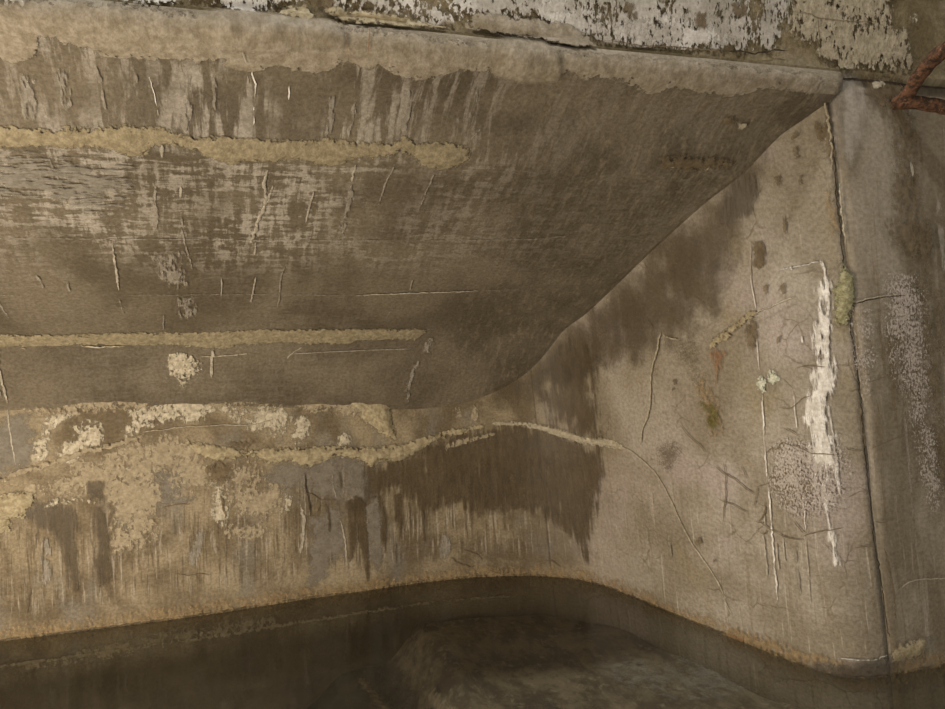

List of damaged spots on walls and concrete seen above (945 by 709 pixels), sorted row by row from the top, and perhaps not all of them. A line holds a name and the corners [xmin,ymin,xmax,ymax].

flaking render [0,0,917,98]
crack [778,102,847,272]
rust [864,75,945,489]
flaking render [24,433,383,587]
damp [0,165,945,690]
crack [680,425,842,540]
crack [767,294,945,636]